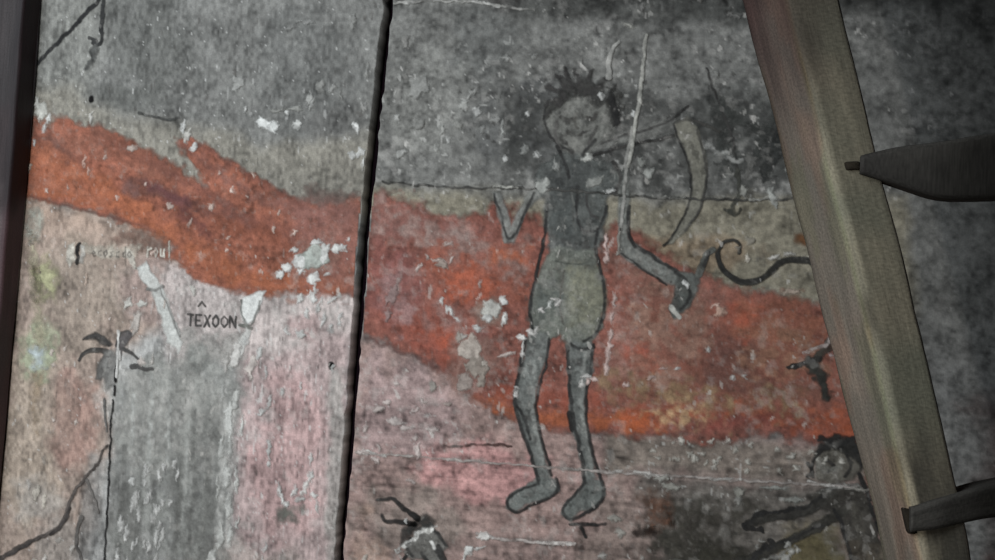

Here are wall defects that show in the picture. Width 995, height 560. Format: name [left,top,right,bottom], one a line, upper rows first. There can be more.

peeling [276,238,350,333]
peeling [416,255,453,271]
crack [342,0,854,560]
peeling [440,296,538,391]